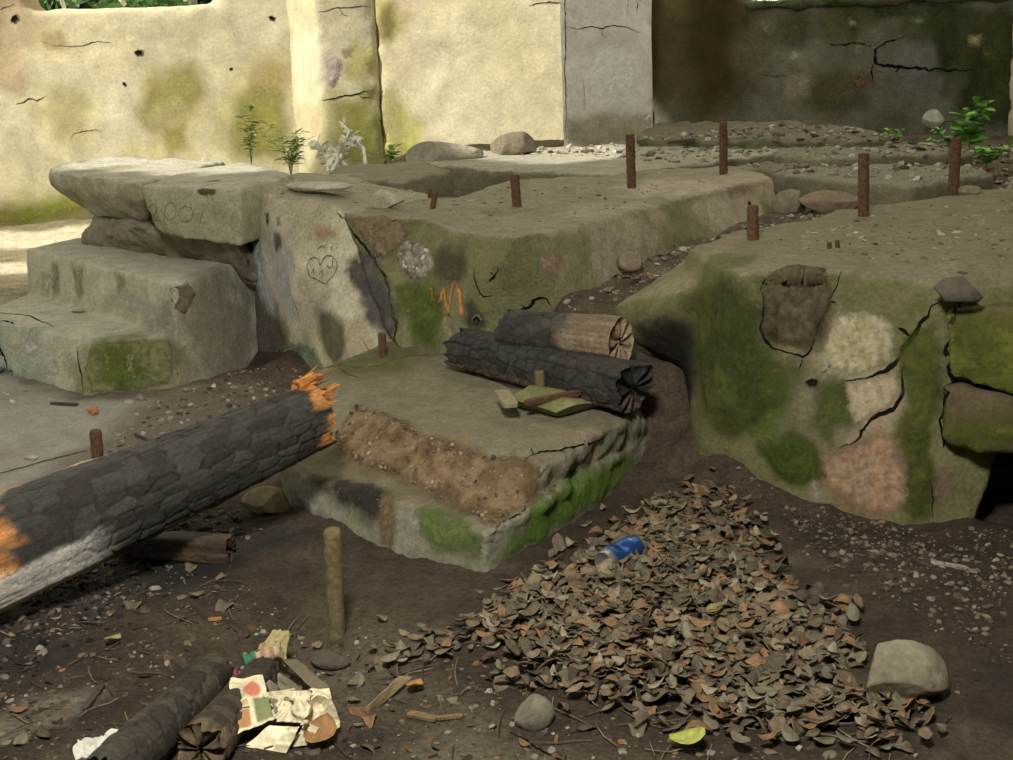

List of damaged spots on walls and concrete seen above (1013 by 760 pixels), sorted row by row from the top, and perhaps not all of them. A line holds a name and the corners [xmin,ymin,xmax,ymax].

crack [529,0,640,139]
crack [830,34,973,82]
crack [0,348,13,375]
leakage [637,324,691,400]
peeling [764,264,899,423]
crack [759,271,1012,519]